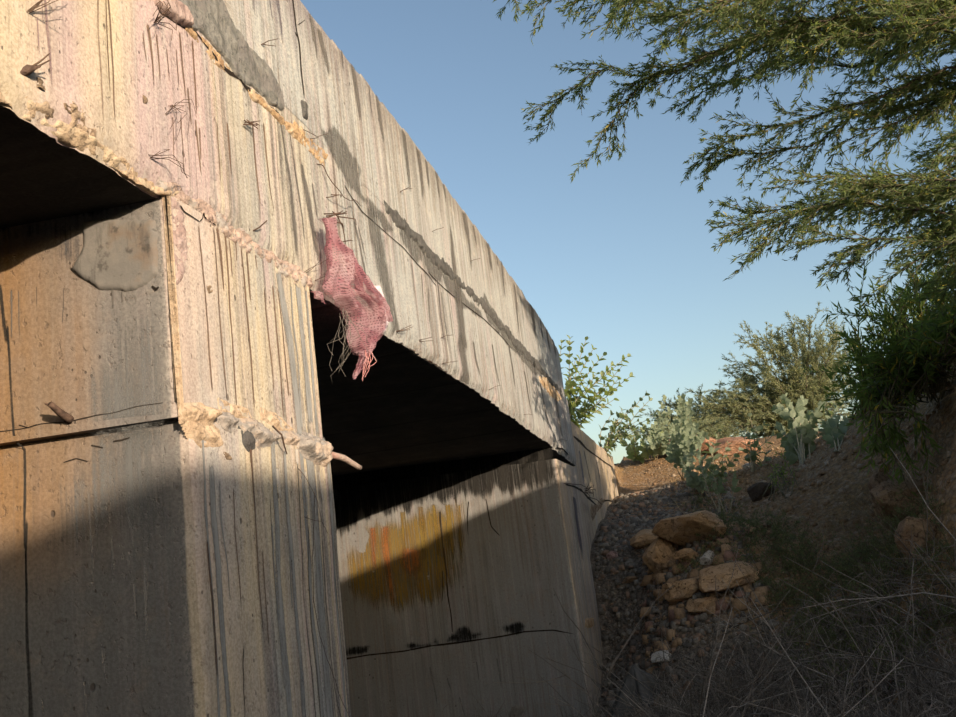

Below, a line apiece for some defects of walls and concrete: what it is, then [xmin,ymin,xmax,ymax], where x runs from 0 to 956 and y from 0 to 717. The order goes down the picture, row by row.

leakage [98,0,116,119]
leakage [167,33,201,170]
leakage [217,123,232,181]
spalling [248,89,328,166]
crack [345,186,512,349]
crack [0,403,179,463]
crack [467,500,499,535]
crack [347,512,571,660]